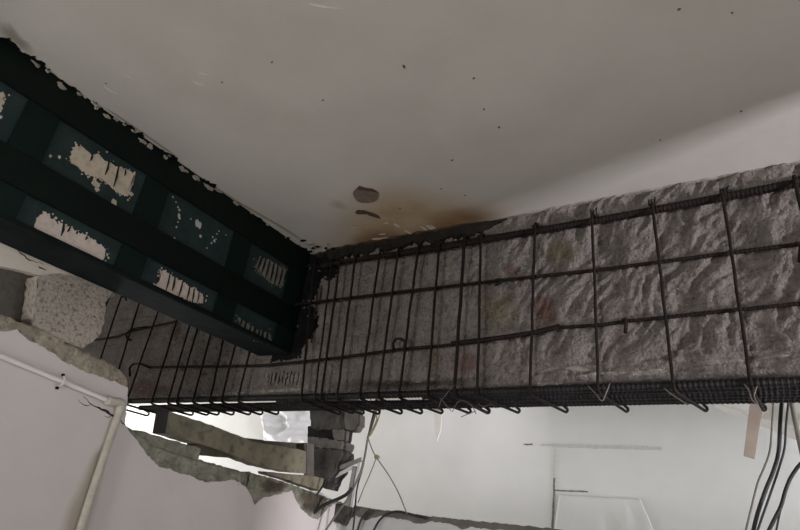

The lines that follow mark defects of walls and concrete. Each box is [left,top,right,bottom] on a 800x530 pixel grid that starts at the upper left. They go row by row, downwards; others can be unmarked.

peeling [77,92,153,150]
peeling [49,142,136,205]
peeling [179,166,222,193]
peeling [34,211,110,262]
spalling [300,178,800,268]
peeling [153,267,207,304]
peeling [253,256,287,291]
spalling [294,242,800,306]
spalling [0,314,128,388]
spalling [150,301,800,369]